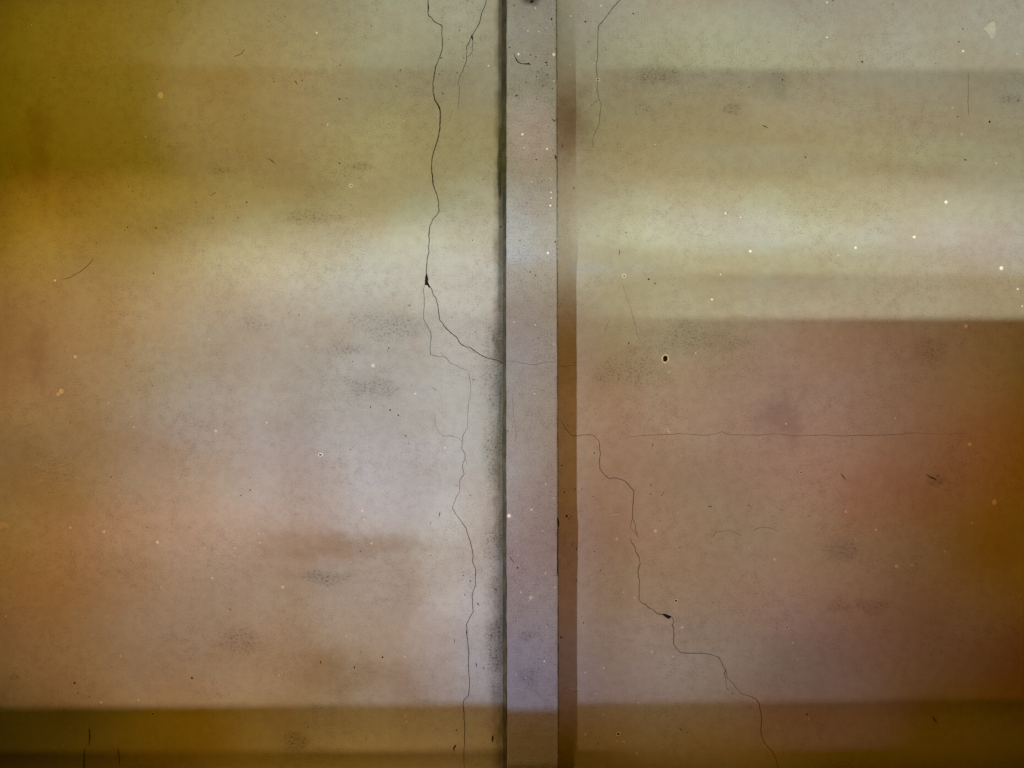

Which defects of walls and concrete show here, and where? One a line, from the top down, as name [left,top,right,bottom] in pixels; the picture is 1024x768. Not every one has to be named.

crack [423,2,570,768]
crack [562,423,778,768]